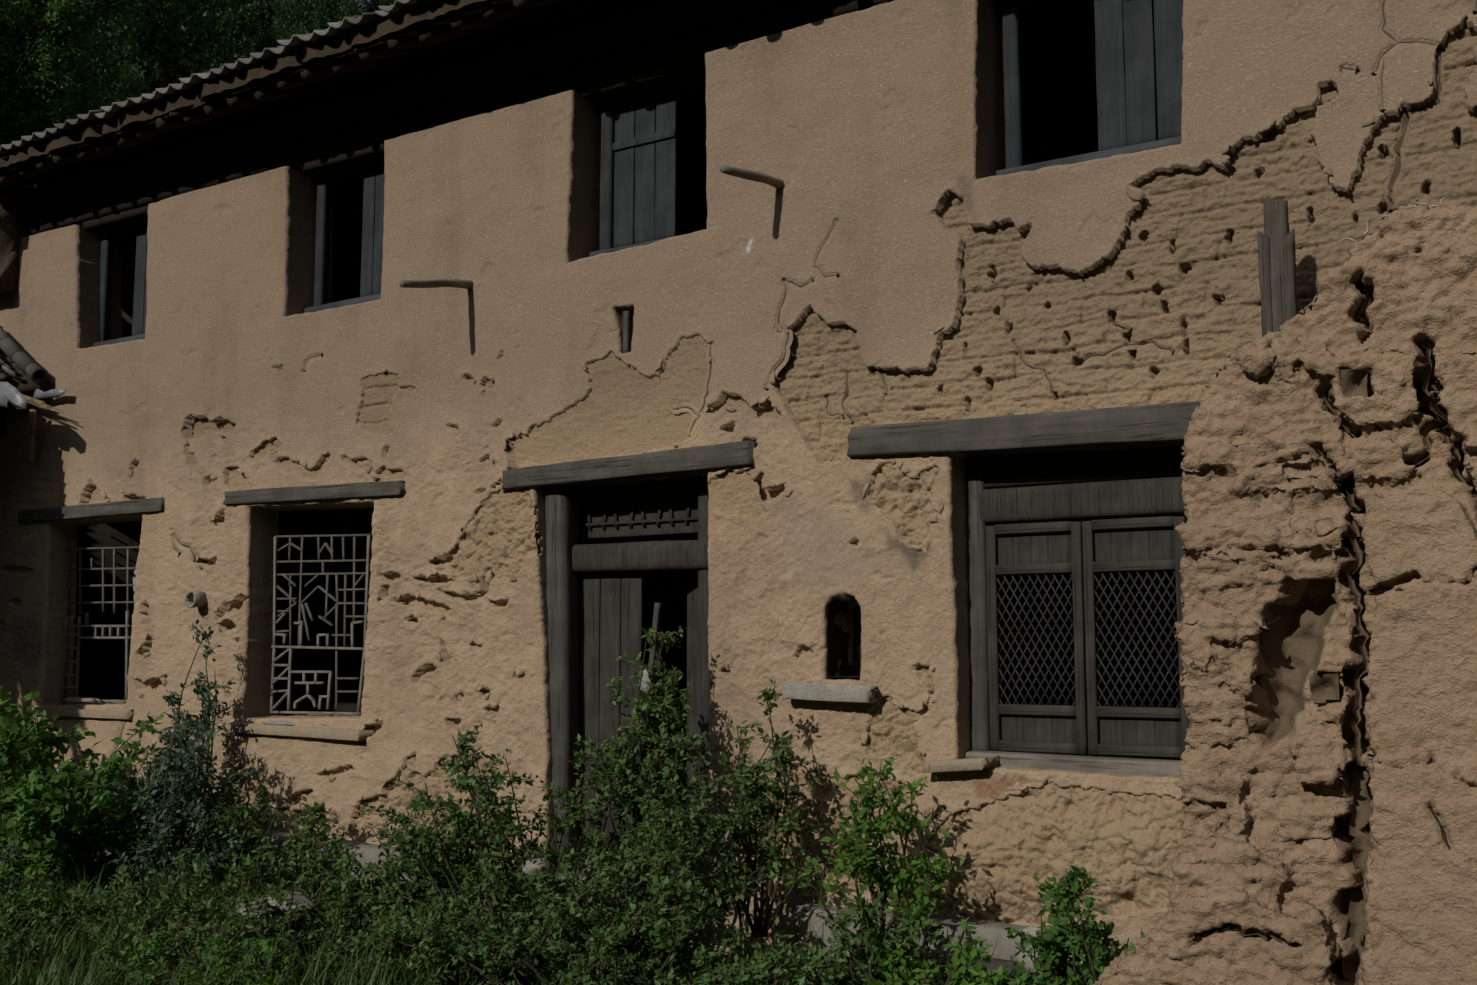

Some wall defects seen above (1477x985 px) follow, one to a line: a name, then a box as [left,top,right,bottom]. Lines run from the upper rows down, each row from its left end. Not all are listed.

crack [1372,0,1462,211]
crack [764,220,838,389]
flaking render [511,22,1477,465]
flaking render [210,367,415,490]
crack [1413,340,1477,499]
flaking render [412,483,538,598]
flaking render [710,465,793,517]
flaking render [862,459,944,551]
crack [1316,389,1408,985]
flaking render [235,762,354,828]
flaking render [334,754,505,855]
crack [1428,805,1450,848]